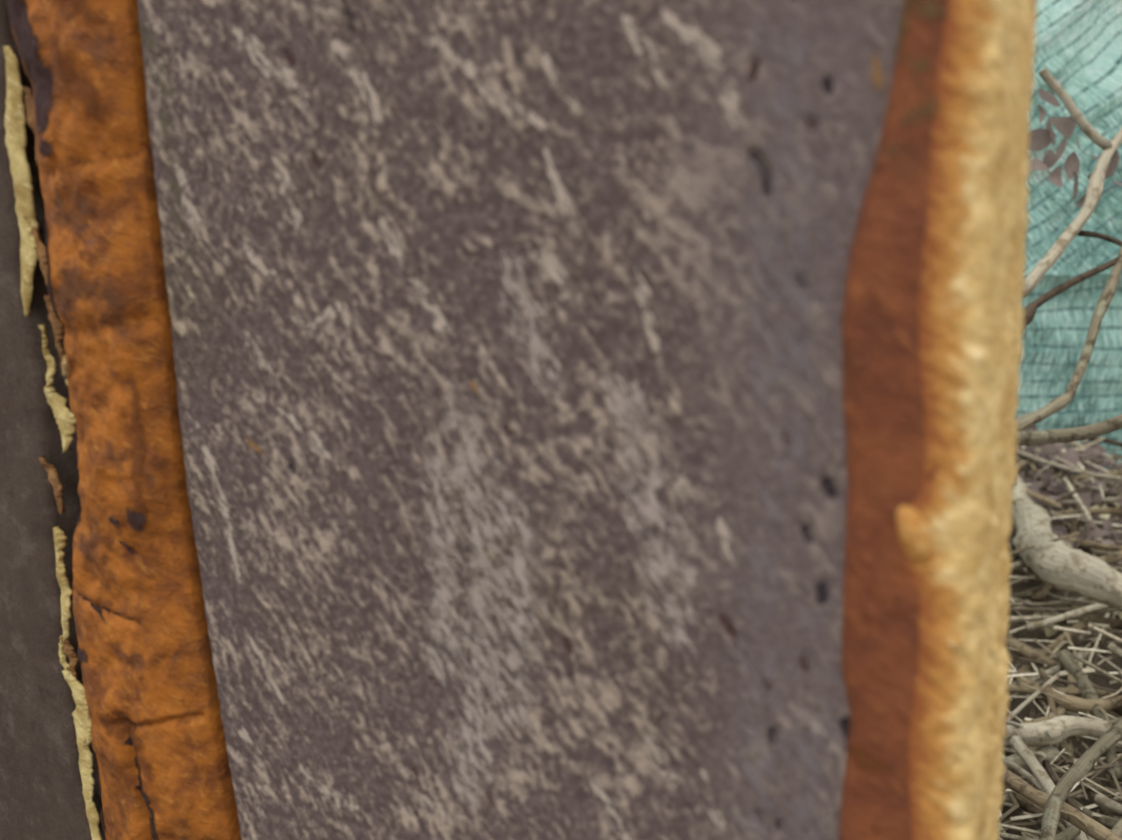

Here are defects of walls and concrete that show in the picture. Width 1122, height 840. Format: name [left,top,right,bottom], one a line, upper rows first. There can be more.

peeling [3,46,77,453]
peeling [38,456,103,840]
crack [76,590,140,624]
crack [135,755,155,840]